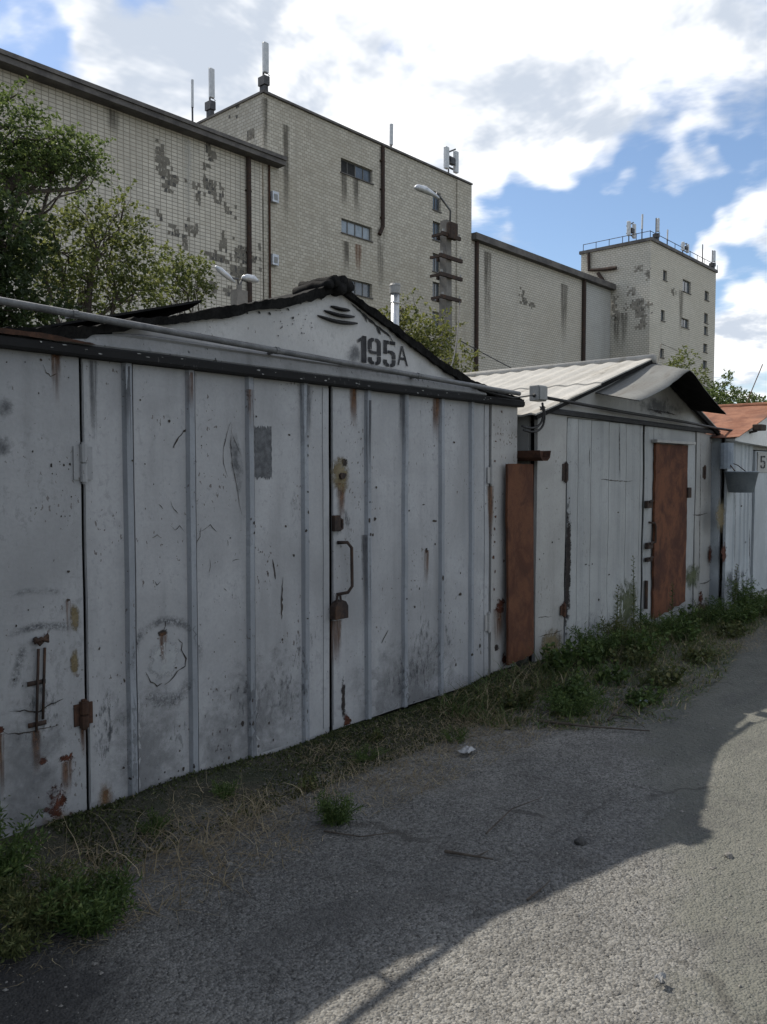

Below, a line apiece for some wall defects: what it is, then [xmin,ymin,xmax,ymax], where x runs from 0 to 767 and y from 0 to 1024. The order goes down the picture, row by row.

spalling [155,139,237,219]
spalling [156,208,199,250]
spalling [196,230,262,297]
spalling [612,265,653,331]
rust [332,458,348,509]
rust [564,501,572,634]
rust [341,680,352,725]
rust [33,730,73,820]